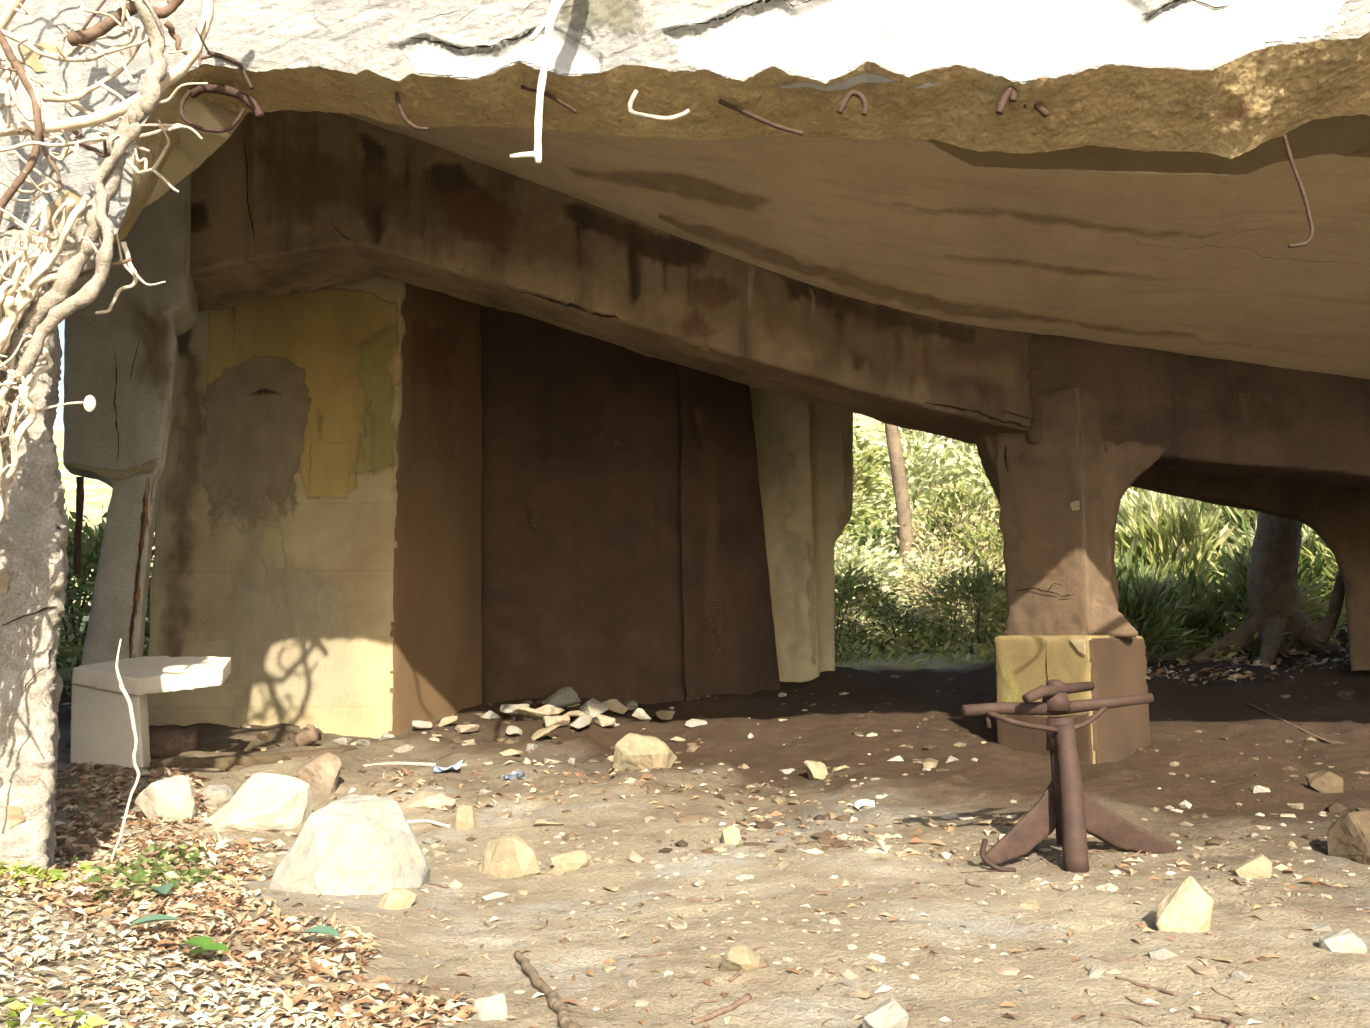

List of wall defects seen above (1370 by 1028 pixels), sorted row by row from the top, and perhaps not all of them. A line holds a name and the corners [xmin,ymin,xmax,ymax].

crack [1151,0,1231,16]
spalling [113,0,1370,248]
damp [143,288,400,574]
crack [1013,583,1075,597]
damp [167,605,189,657]